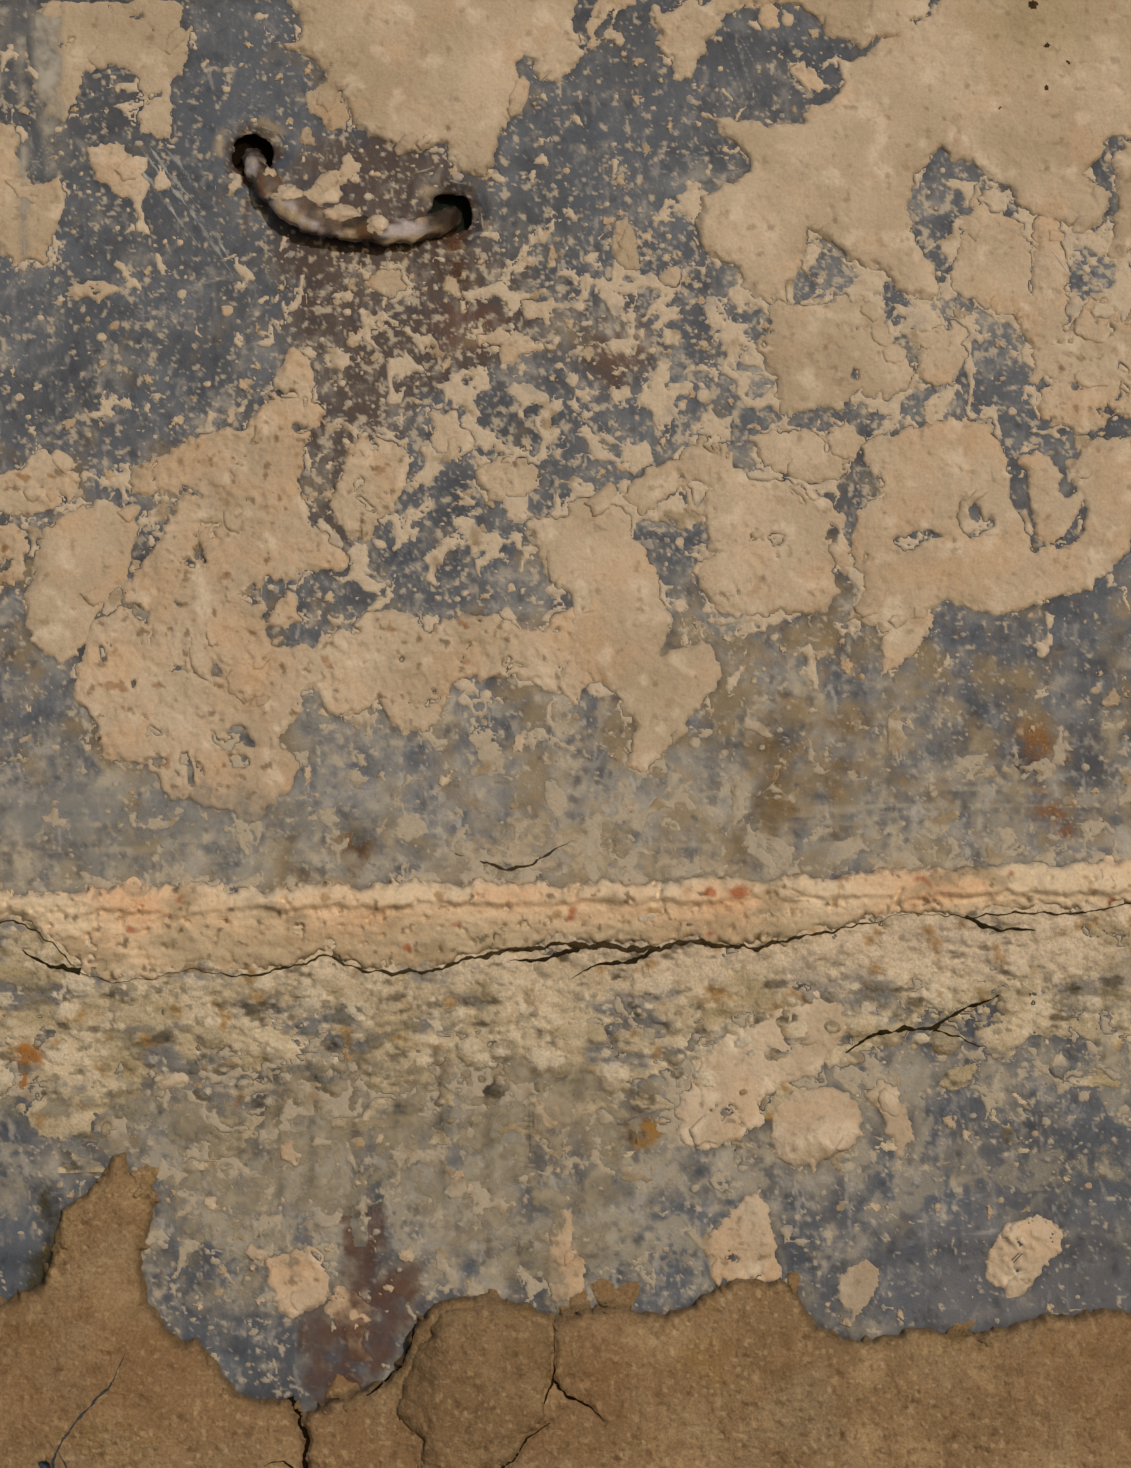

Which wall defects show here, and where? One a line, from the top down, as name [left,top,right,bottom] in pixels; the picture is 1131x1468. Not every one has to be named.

flaking render [0,0,1131,822]
crack [0,902,1131,983]
crack [846,994,999,1053]
flaking render [265,1246,377,1361]
rust [300,1205,421,1396]
flaking render [543,1208,587,1307]
flaking render [704,1188,782,1287]
flaking render [837,1259,881,1323]
flaking render [985,1214,1063,1298]
spalling [38,1456,52,1468]
crack [51,1354,125,1468]
crack [265,1396,310,1468]